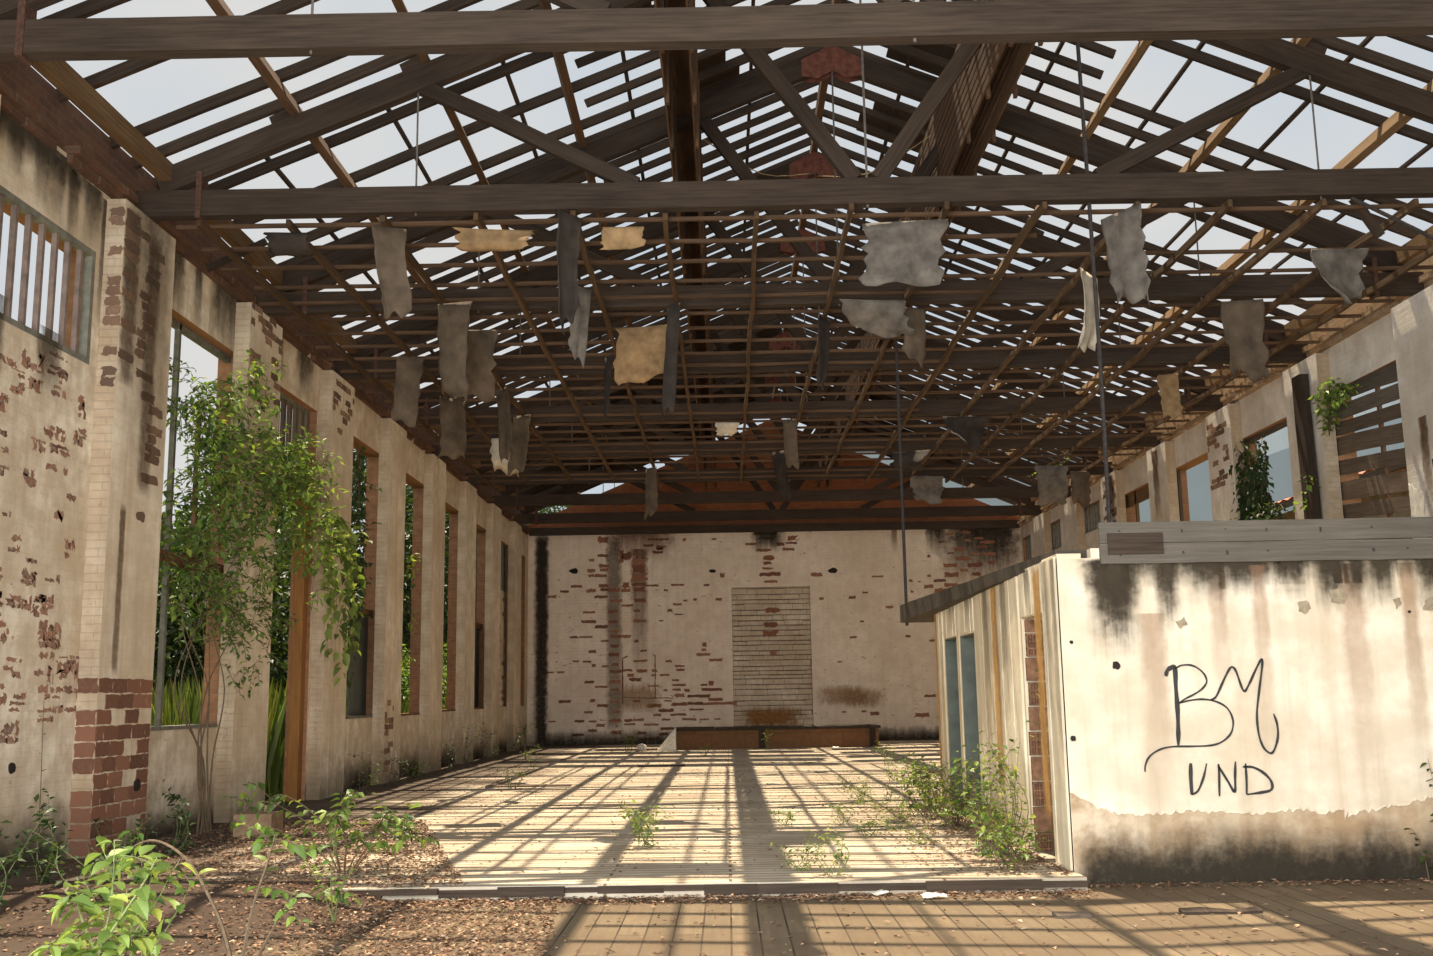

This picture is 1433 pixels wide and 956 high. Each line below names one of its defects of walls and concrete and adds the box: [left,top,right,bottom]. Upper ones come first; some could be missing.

spalling [100,206,165,486]
peeling [0,349,87,488]
peeling [54,493,76,559]
water stain [1087,559,1433,617]
spalling [0,534,153,857]
water stain [1087,841,1433,884]